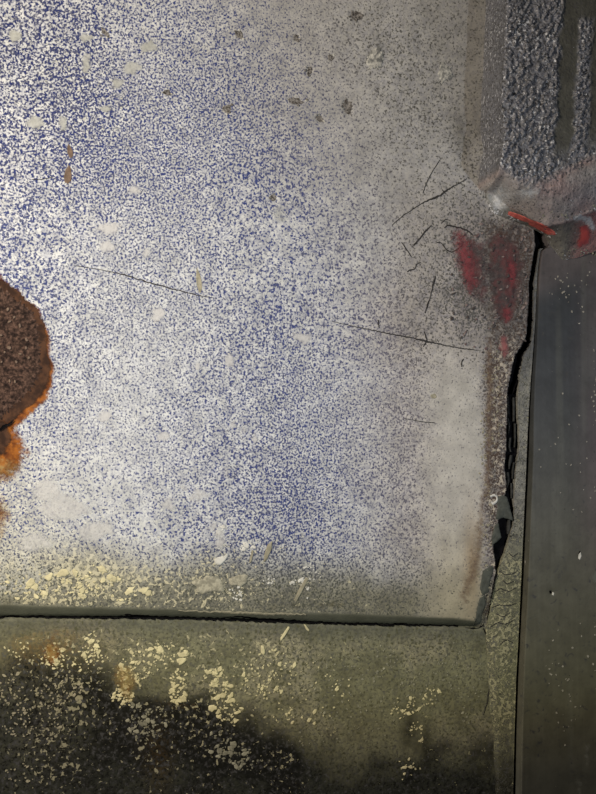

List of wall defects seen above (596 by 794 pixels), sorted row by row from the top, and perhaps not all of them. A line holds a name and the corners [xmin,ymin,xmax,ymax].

crack [394,160,467,223]
crack [401,219,474,272]
corrosion [0,278,54,478]
crack [0,231,546,644]
spalling [460,330,516,626]